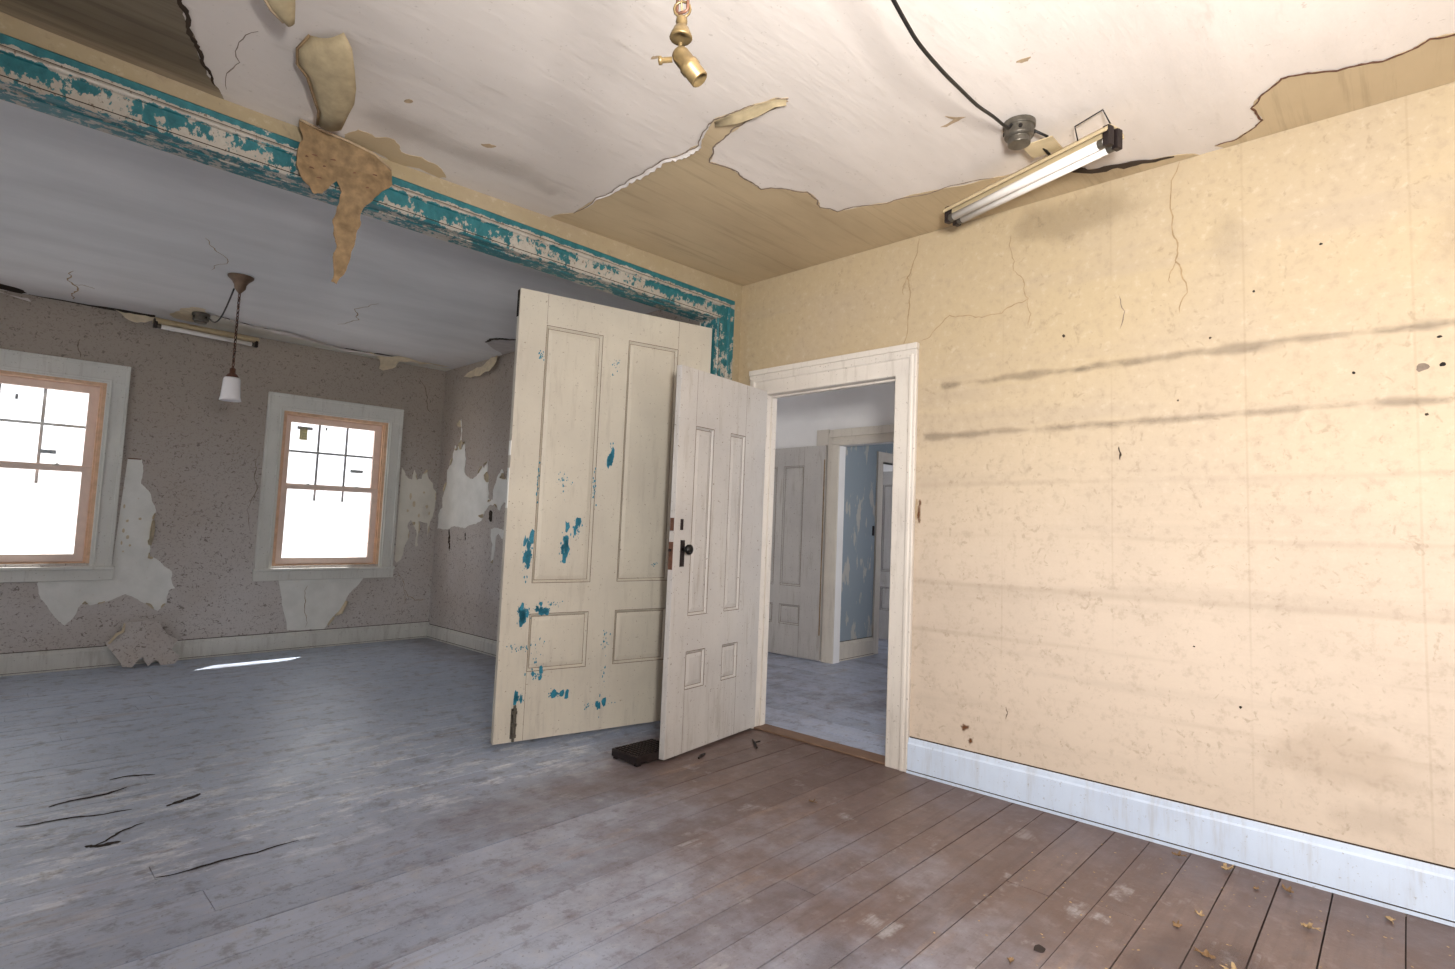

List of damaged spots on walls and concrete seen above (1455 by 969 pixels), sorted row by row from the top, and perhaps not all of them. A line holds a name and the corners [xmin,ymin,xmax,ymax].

peeling [0,0,224,99]
peeling [264,0,446,284]
peeling [551,98,1198,286]
crack [902,237,1031,342]
crack [1168,162,1188,312]
peeling [1215,33,1455,148]
peeling [37,458,175,625]
peeling [279,578,363,630]
peeling [395,420,507,563]